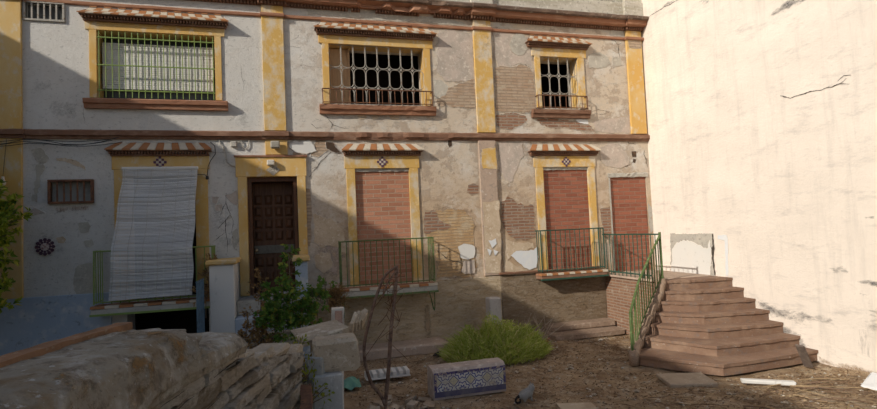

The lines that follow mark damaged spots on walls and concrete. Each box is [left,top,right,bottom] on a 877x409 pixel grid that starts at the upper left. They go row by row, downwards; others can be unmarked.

peeling [409,15,476,109]
flaking render [493,32,637,182]
crack [783,75,848,99]
flaking render [423,183,536,279]